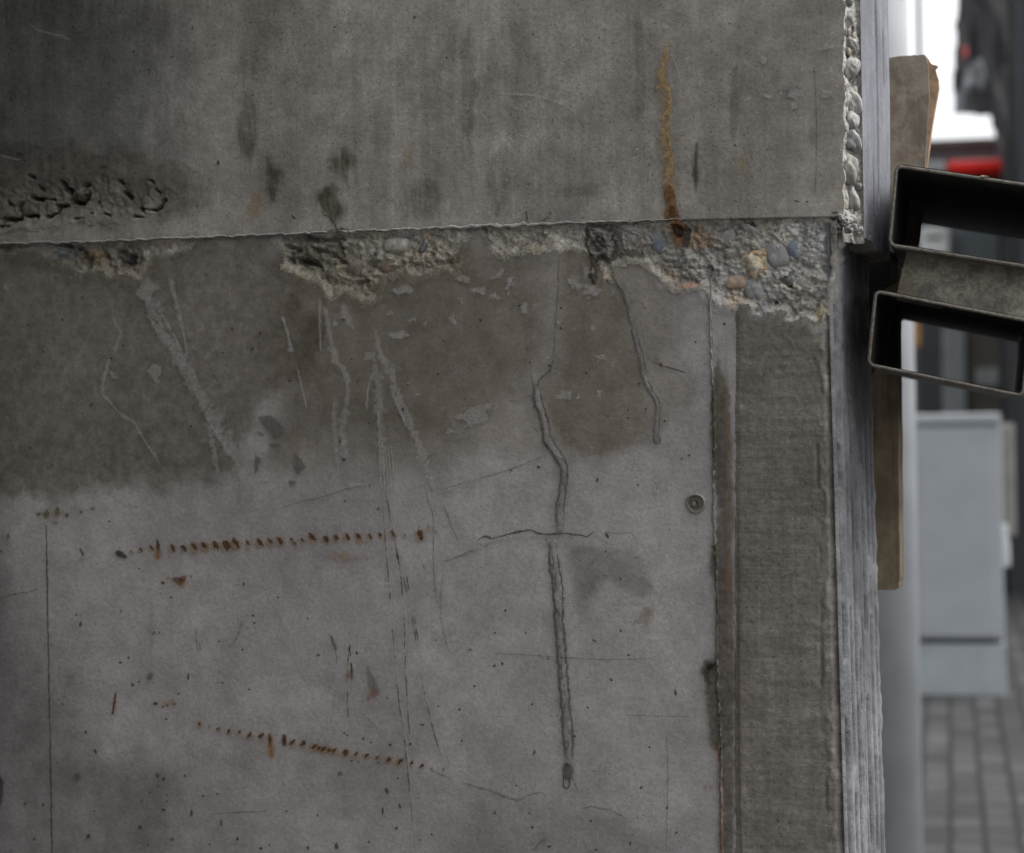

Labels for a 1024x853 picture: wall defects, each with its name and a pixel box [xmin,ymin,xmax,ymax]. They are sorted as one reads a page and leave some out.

rust [656,44,685,248]
spalling [0,238,206,299]
spalling [269,217,845,334]
crack [604,289,685,445]
rust [130,525,436,559]
crack [285,262,650,817]
rust [198,722,444,770]